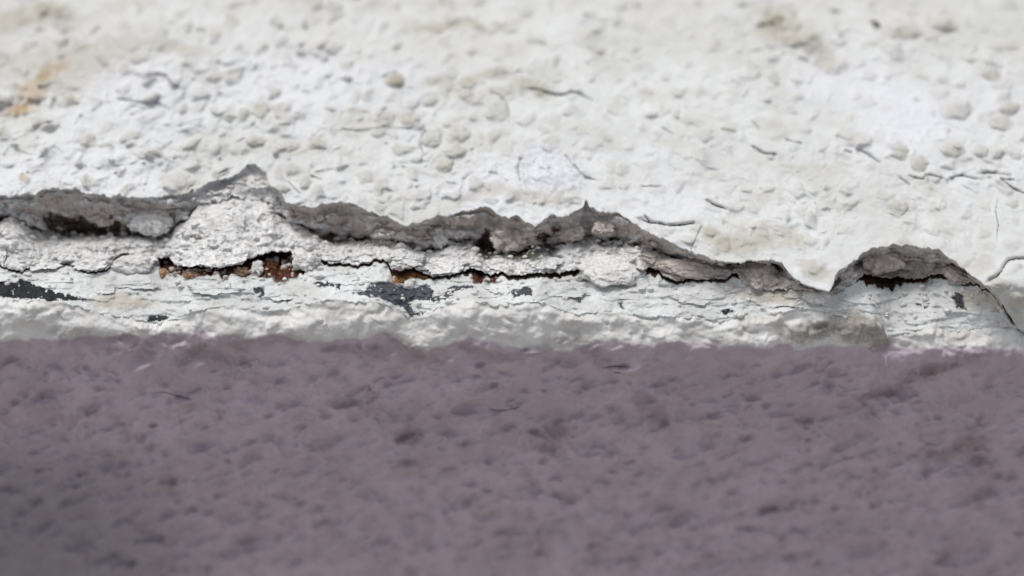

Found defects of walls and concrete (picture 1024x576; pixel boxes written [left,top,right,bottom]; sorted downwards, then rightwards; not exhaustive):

peeling [516,143,580,189]
crack [0,249,30,274]
crack [57,254,129,274]
rust [159,256,298,282]
crack [321,260,390,269]
rust [391,271,429,290]
rust [472,272,497,283]
crack [428,271,580,281]
spalling [0,165,1024,348]
crack [647,271,739,285]